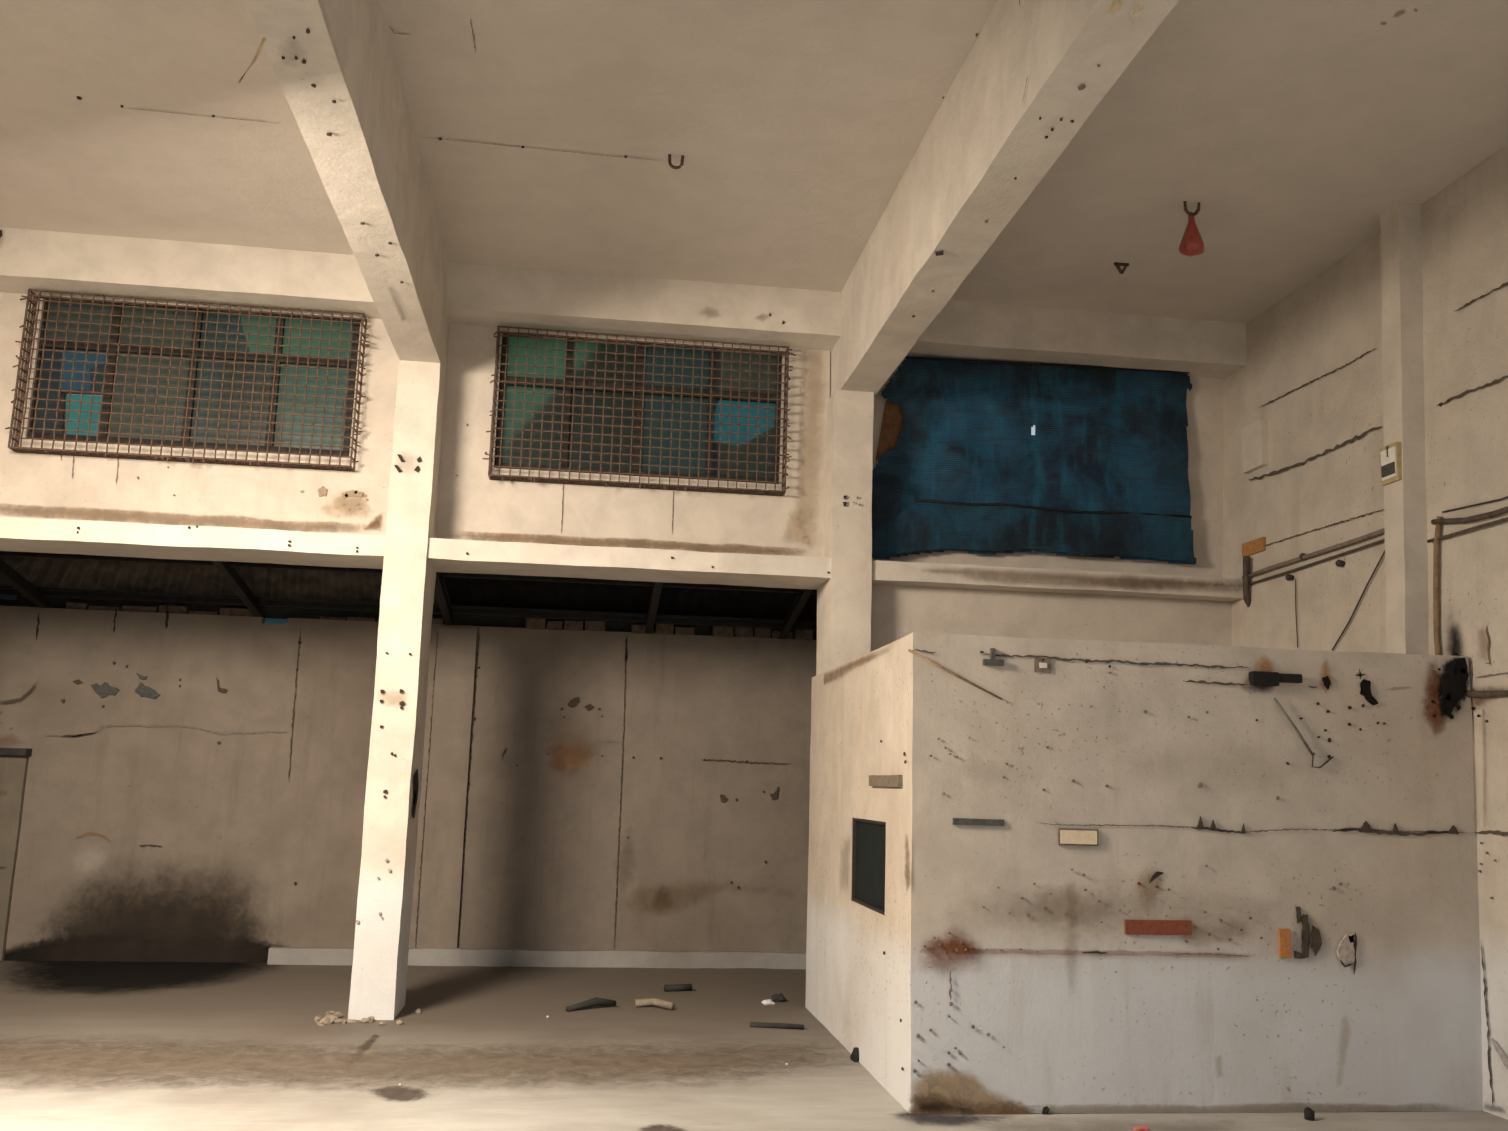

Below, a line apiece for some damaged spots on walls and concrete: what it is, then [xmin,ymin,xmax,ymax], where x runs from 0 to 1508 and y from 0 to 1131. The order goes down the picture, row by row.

rust [1425,666,1443,731]
rust [923,932,1038,954]